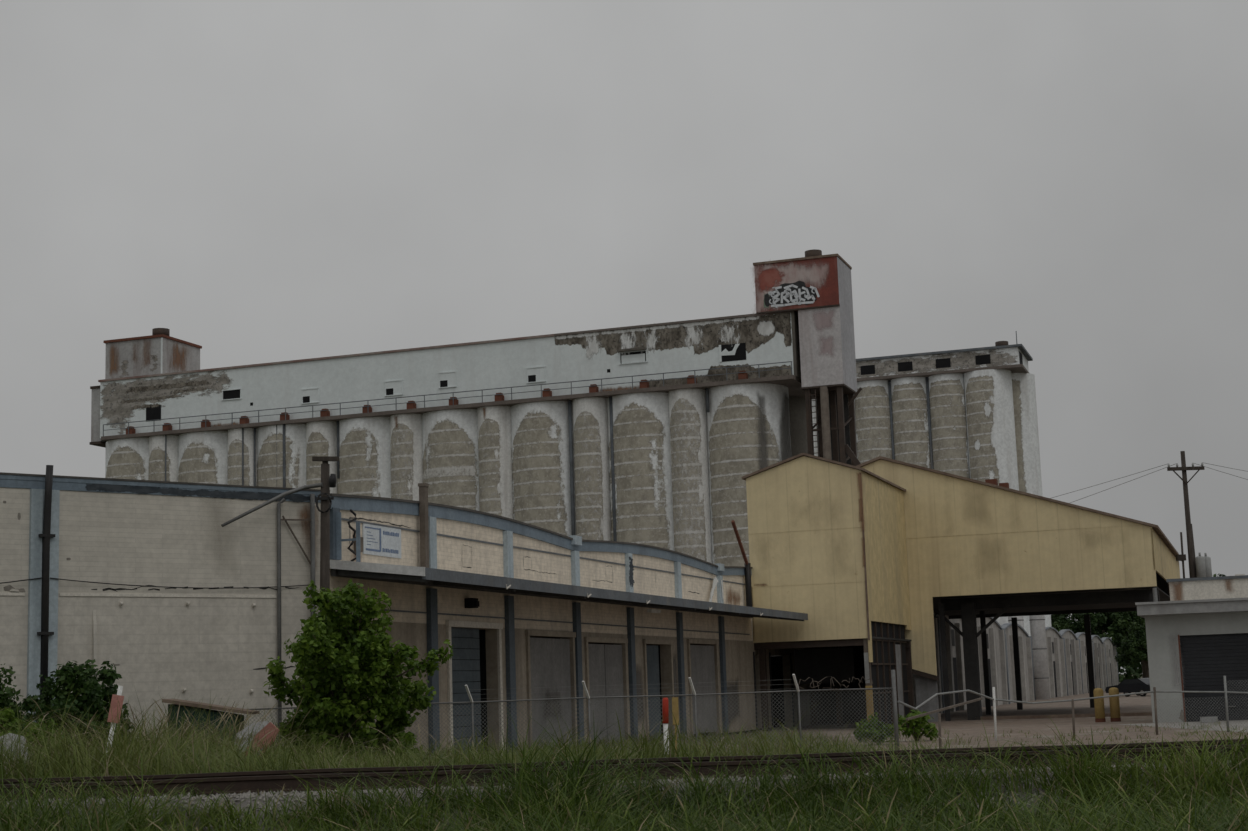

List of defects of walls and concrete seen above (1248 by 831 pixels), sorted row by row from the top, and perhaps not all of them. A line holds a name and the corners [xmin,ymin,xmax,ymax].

rust [173,346,186,370]
peeling [86,263,828,602]
peeling [855,376,999,486]
peeling [1012,379,1026,492]